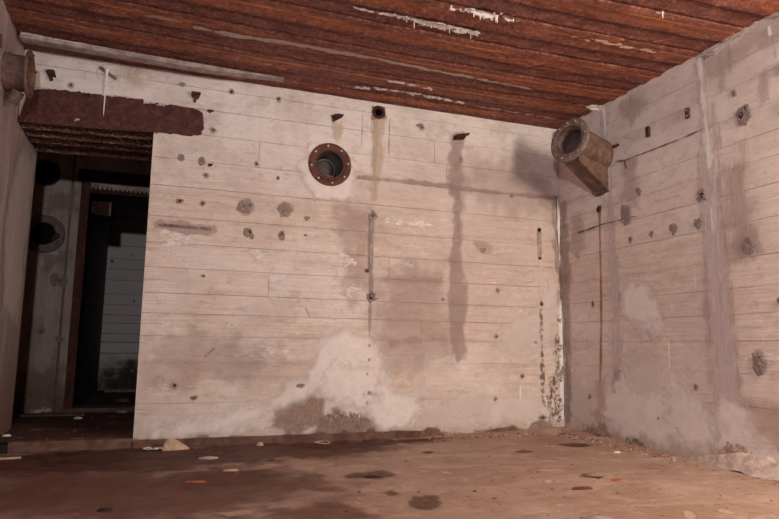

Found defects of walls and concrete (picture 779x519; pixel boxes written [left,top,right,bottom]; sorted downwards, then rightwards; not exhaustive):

damp [355,80,465,104]
spalling [735,104,751,126]
damp [298,142,355,201]
damp [583,57,779,459]
damp [0,260,590,519]
spalling [737,350,779,375]